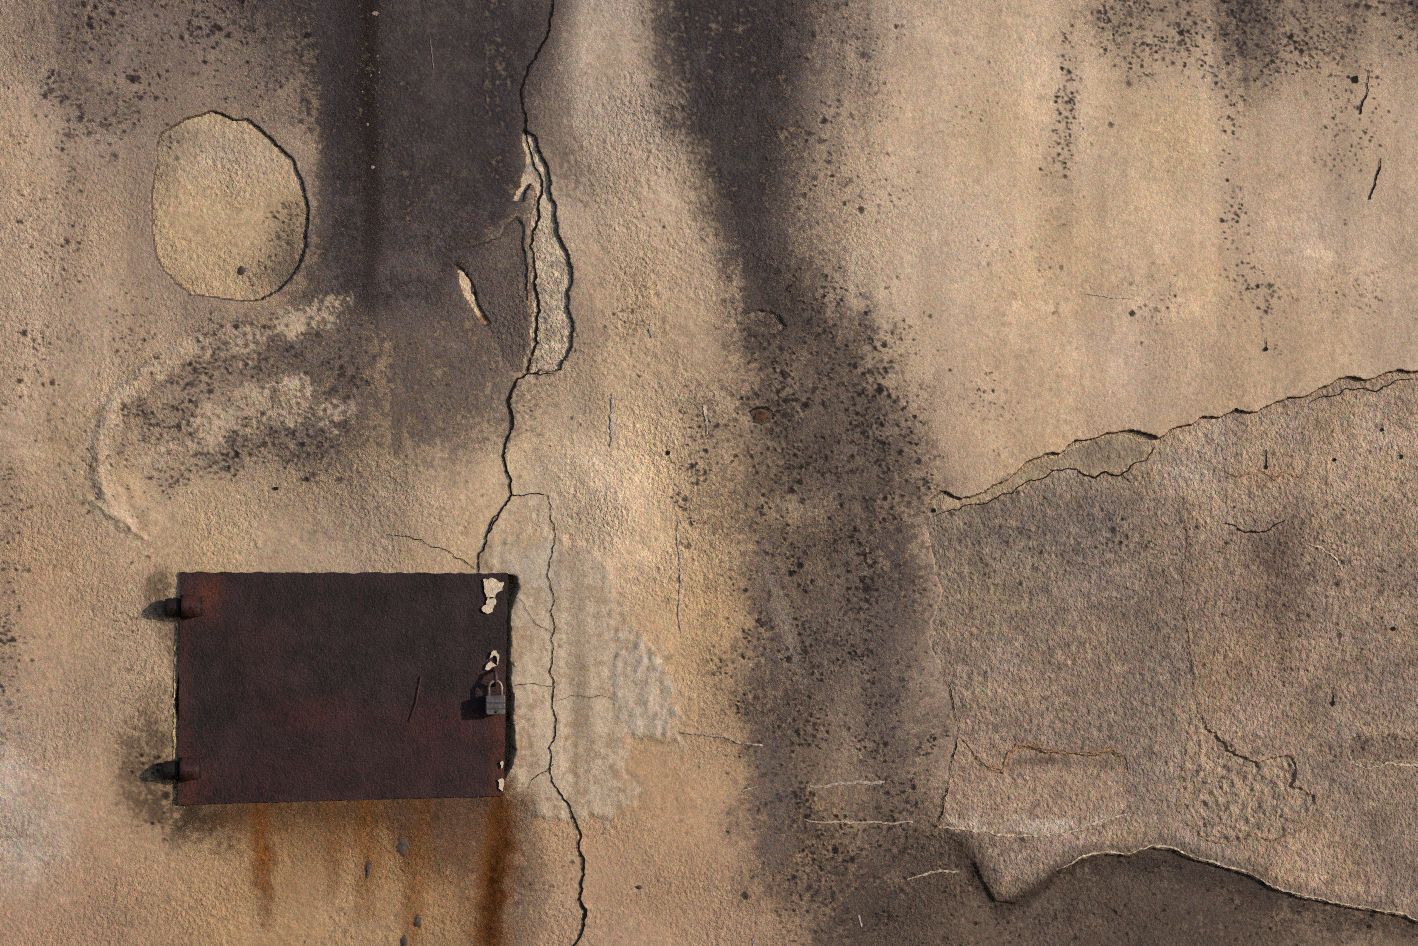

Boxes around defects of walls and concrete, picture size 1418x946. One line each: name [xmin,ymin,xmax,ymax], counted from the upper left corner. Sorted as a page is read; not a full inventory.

damp [0,566,34,859]
spalling [151,110,310,302]
damp [39,0,567,536]
corrosion [478,819,512,946]
crack [388,0,615,946]
spalling [454,130,574,375]
damp [649,0,1418,946]
spalling [926,369,1418,922]